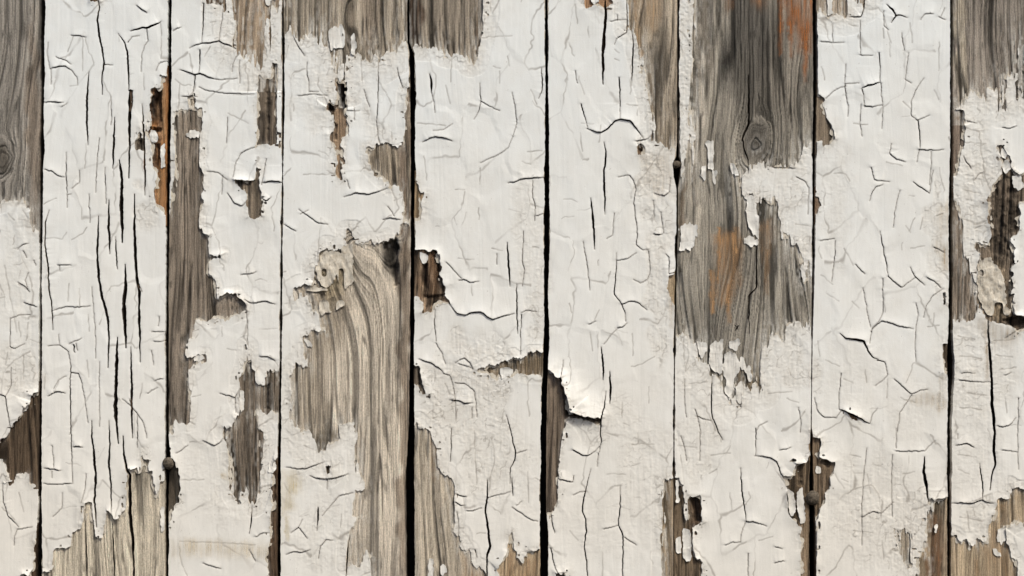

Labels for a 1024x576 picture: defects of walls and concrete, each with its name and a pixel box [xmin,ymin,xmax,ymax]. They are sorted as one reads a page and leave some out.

peeling [0,381,41,496]
crack [10,4,240,576]
peeling [128,66,257,431]
peeling [203,0,489,188]
peeling [218,79,540,576]
crack [428,74,449,140]
crack [425,231,537,411]
crack [565,0,665,576]
peeling [584,0,865,408]
crack [825,5,934,431]
crack [921,446,929,499]
peeling [938,0,1024,337]